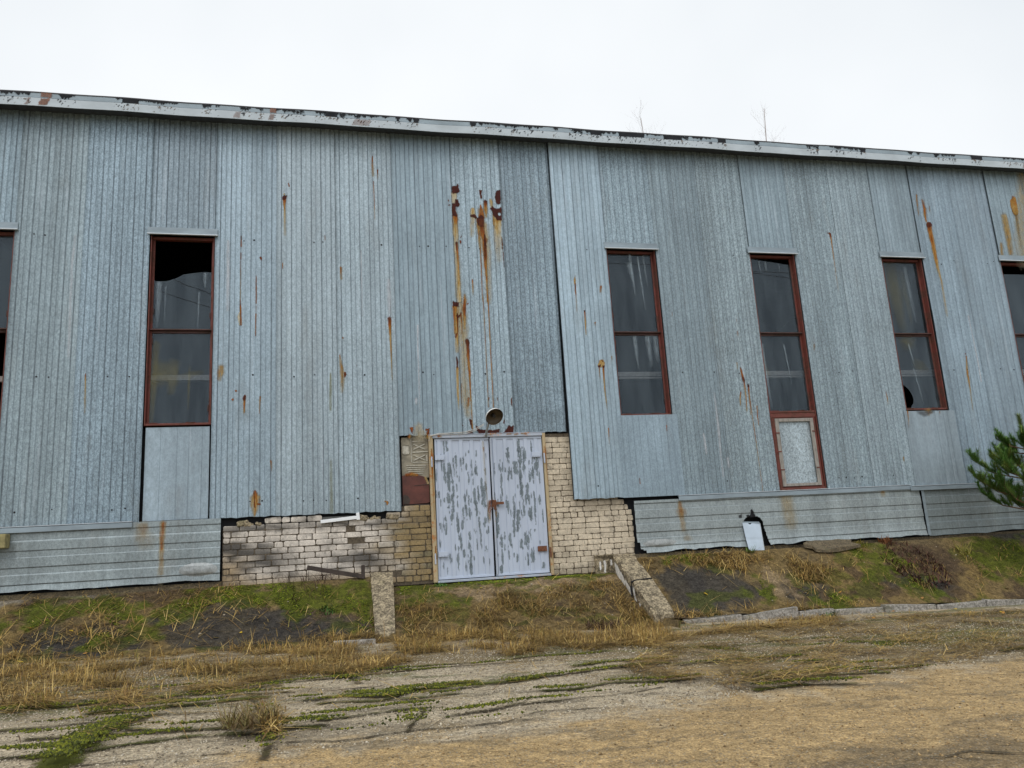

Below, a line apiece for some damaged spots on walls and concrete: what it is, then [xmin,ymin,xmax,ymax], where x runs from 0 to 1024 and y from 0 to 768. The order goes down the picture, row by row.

peeling [116,98,178,112]
peeling [240,107,419,127]
peeling [470,122,726,146]
peeling [806,145,866,157]
rust [916,194,946,305]
rust [1000,173,1024,255]
rust [448,184,504,429]
rust [740,368,763,489]
rust [251,490,261,516]
peeling [435,419,545,575]